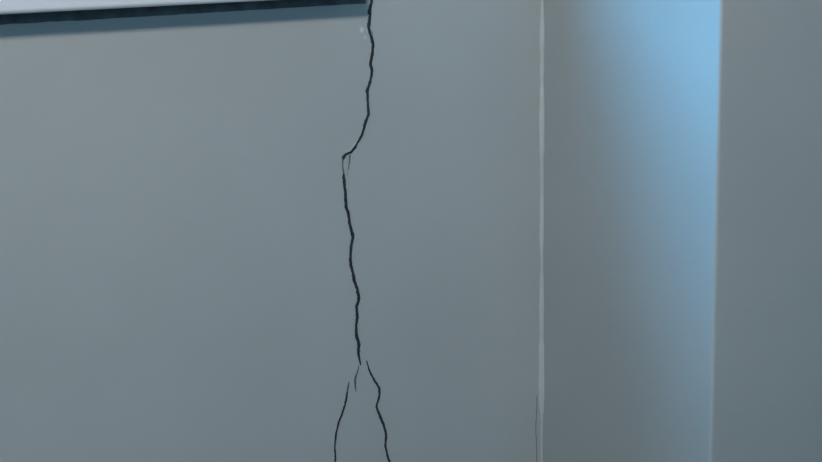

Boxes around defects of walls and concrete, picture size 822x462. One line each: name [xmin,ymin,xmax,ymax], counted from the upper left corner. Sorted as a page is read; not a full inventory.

crack [0,0,391,462]